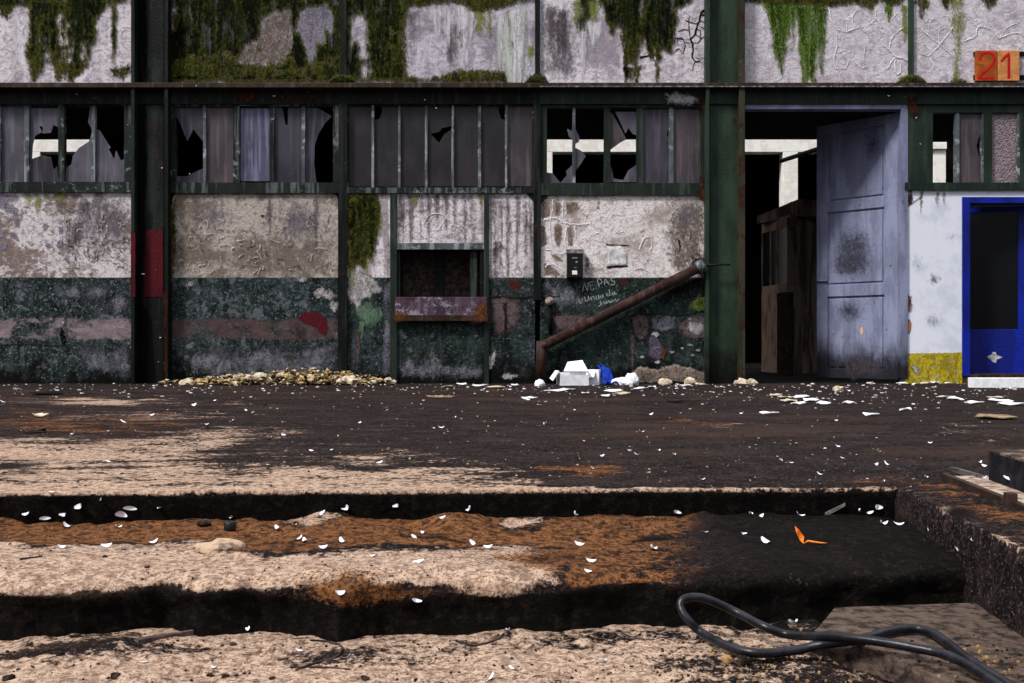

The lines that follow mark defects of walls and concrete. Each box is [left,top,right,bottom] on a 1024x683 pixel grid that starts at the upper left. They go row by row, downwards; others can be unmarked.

water stain [27,0,119,78]
water stain [239,8,292,64]
water stain [409,0,679,83]
crack [640,9,704,71]
water stain [768,5,828,82]
peeling [0,193,20,250]
water stain [347,197,379,269]
water stain [665,202,704,274]
peeling [43,210,131,376]
rust [472,301,489,323]